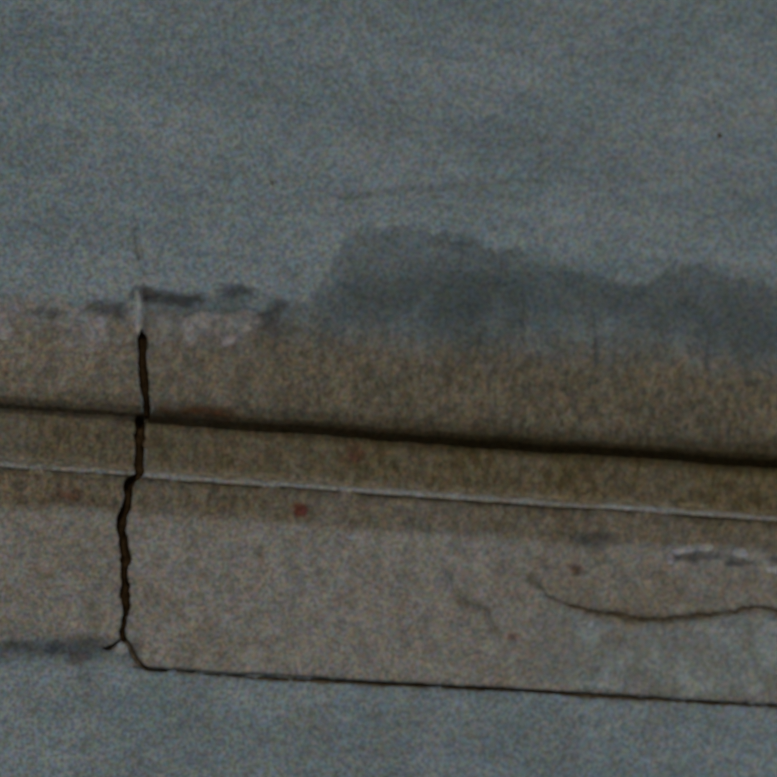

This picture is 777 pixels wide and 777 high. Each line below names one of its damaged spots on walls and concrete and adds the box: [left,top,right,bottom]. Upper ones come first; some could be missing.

crack [103,229,777,708]